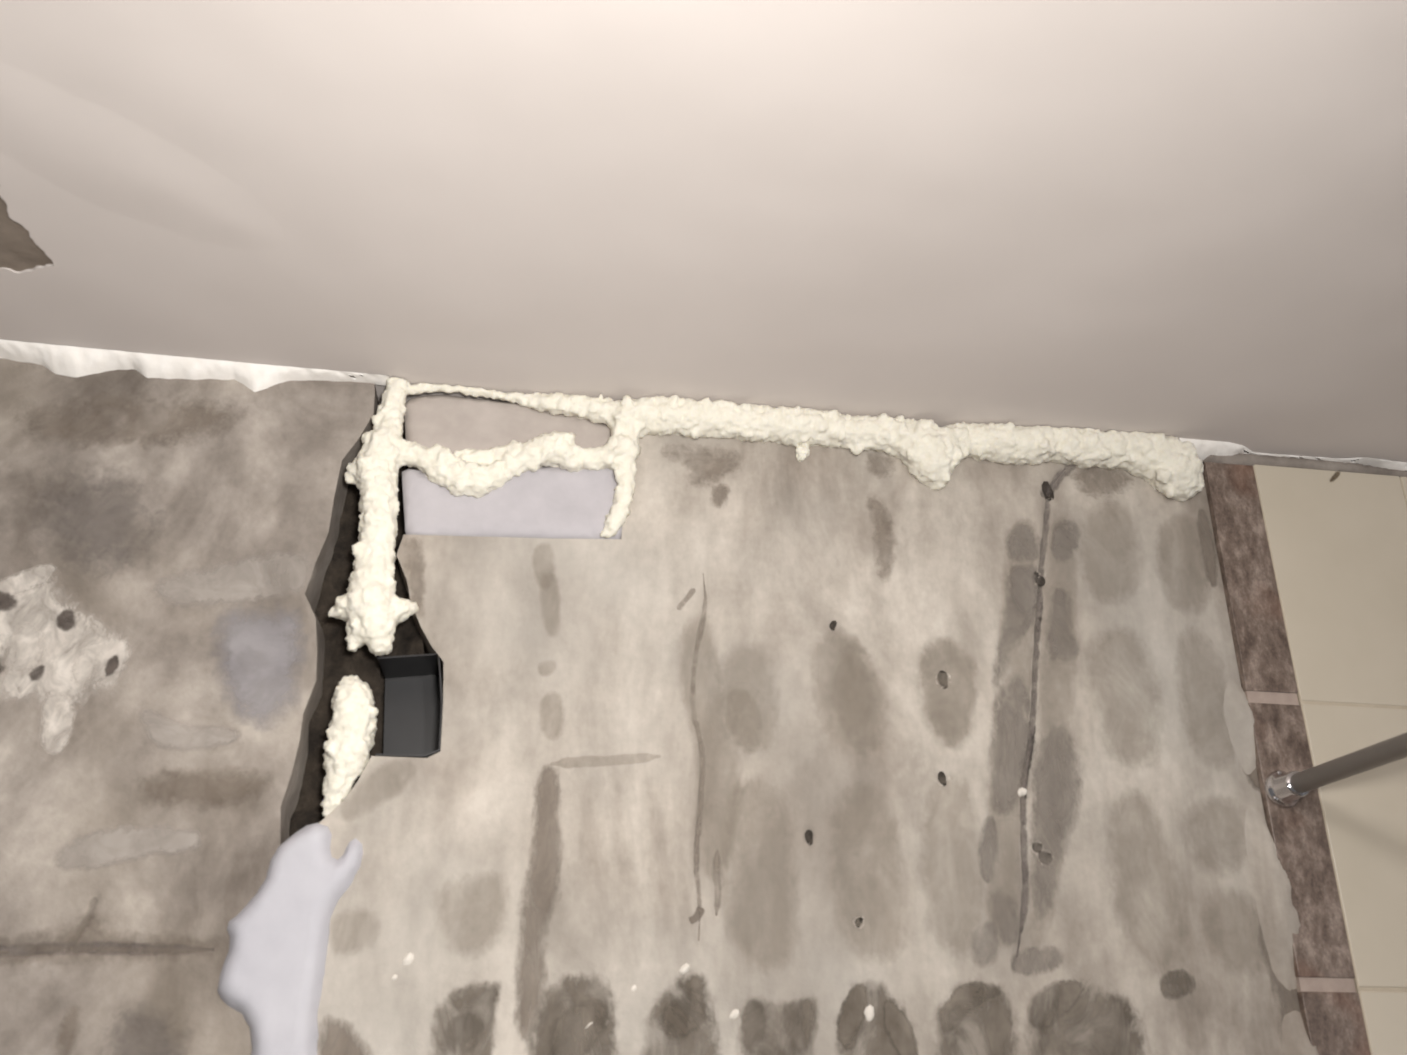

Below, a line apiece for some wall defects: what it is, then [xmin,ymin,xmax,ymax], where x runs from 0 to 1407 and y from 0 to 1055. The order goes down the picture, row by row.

spalling [0,197,53,271]
crack [977,464,1081,974]
crack [685,581,720,941]
damp [517,767,559,1035]
damp [1161,970,1195,998]
damp [1263,946,1300,1017]
damp [321,1022,364,1055]